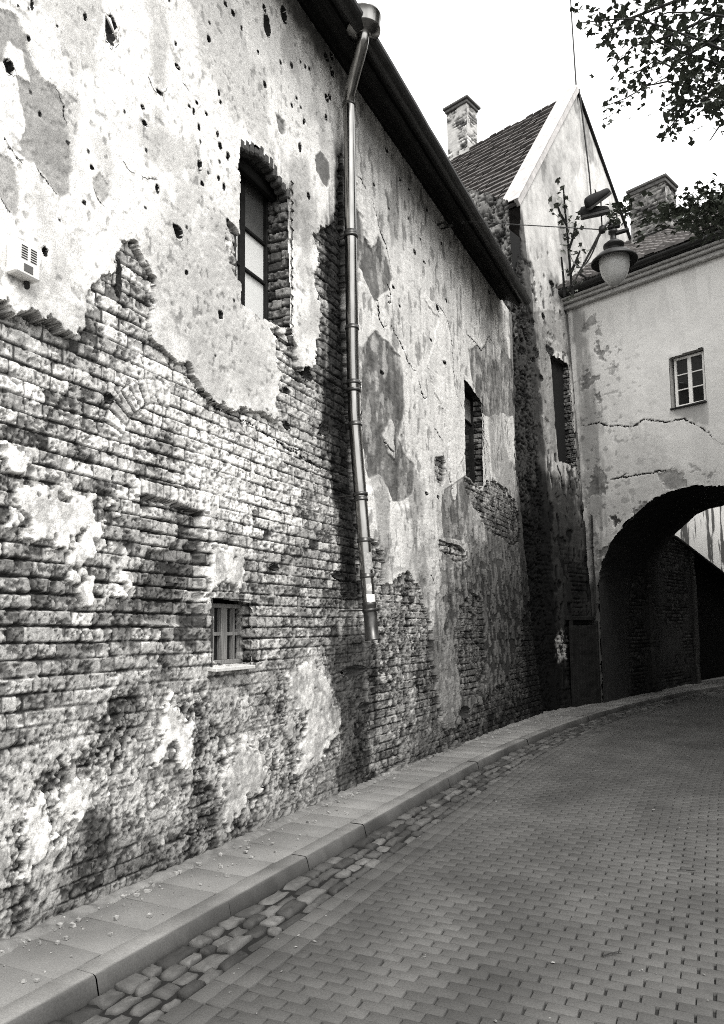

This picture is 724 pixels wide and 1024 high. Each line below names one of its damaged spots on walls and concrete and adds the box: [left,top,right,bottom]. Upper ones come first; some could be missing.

water stain [520,208,536,313]
water stain [360,101,530,760]
crack [610,467,677,480]
crack [588,418,724,445]
spalling [0,149,608,939]